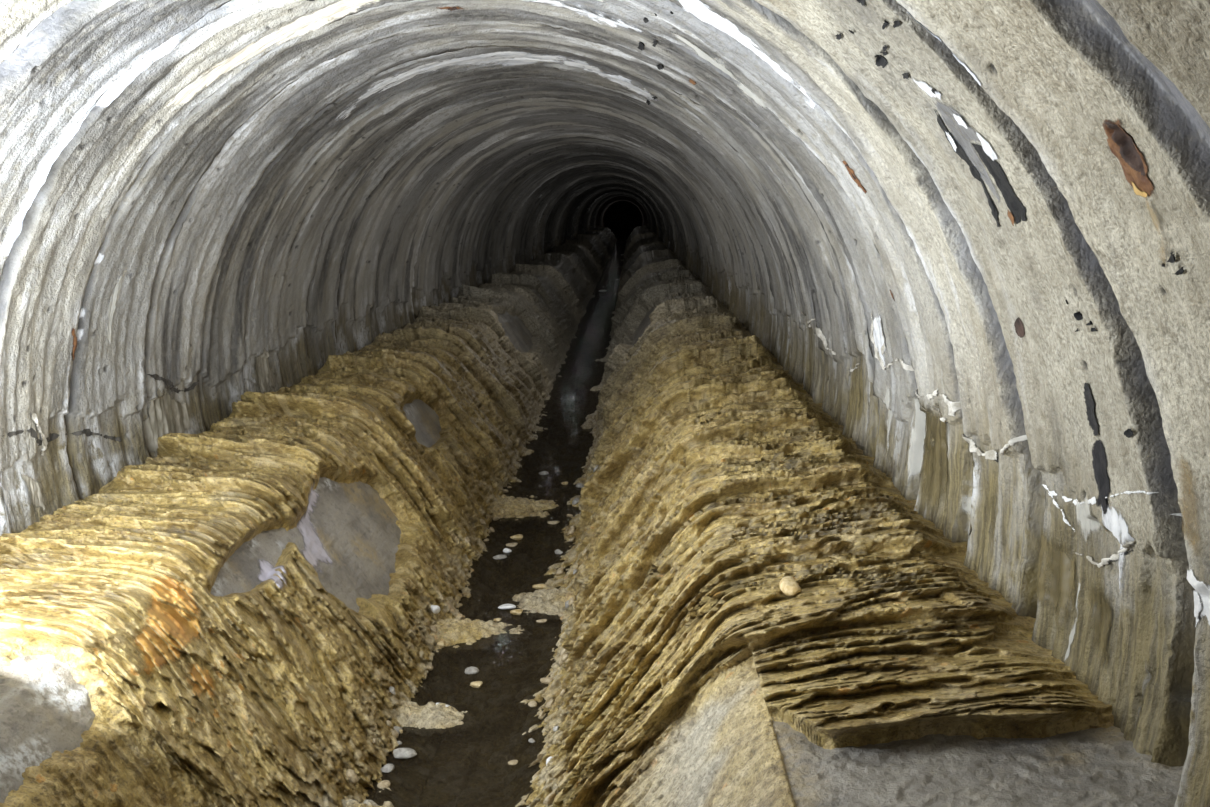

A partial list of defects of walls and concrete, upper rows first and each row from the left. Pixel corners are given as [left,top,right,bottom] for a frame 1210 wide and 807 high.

spalling [875,45,888,68]
damp [0,35,179,256]
peeling [902,73,1026,227]
rust [1102,119,1159,232]
damp [0,225,1114,807]
crack [1043,485,1183,532]